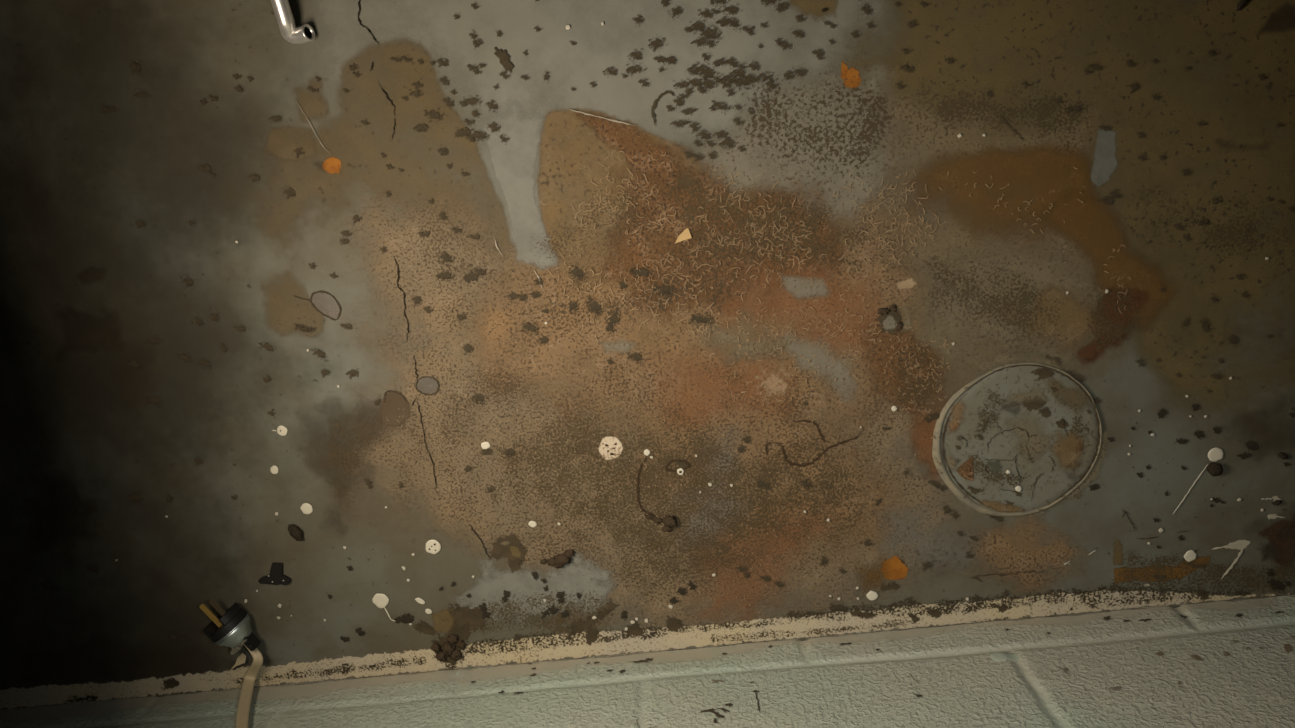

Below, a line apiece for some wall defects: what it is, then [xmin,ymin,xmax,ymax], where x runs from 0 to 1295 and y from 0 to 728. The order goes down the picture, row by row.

crack [358,0,396,137]
corrosion [578,114,840,314]
corrosion [919,148,1171,325]
leakage [263,0,1295,634]
corrosion [867,329,962,472]
corrosion [865,556,908,591]
corrosion [1260,520,1295,565]